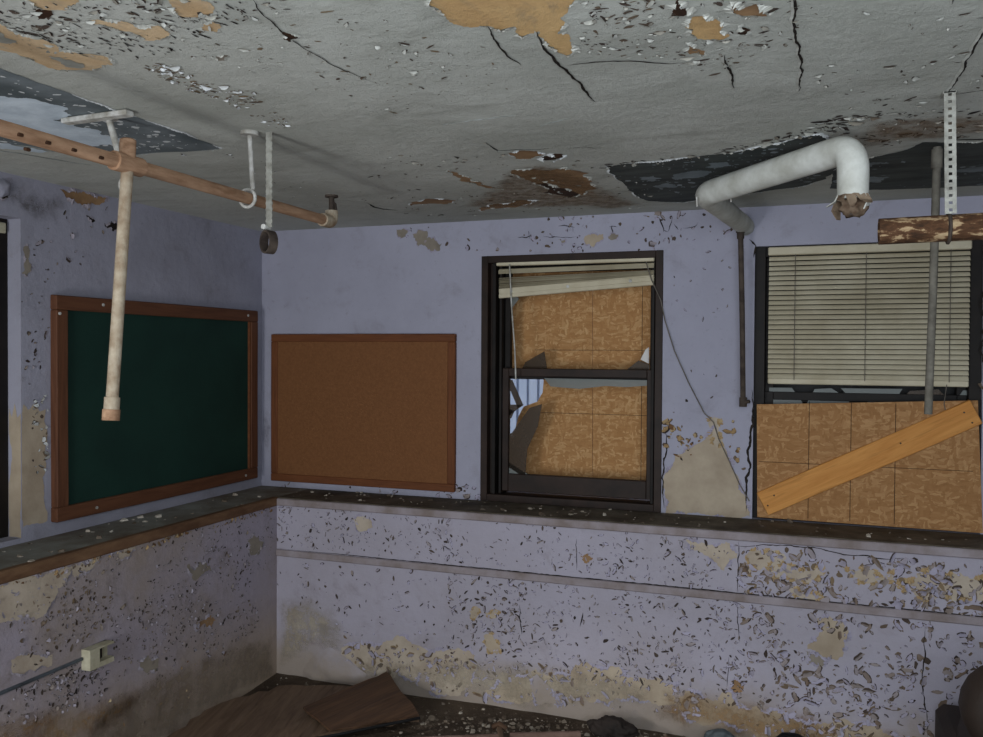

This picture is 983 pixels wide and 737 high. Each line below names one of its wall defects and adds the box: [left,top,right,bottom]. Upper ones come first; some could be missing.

peeling [0,69,234,158]
spalling [281,24,326,78]
peeling [336,37,454,114]
crack [486,26,521,65]
crack [534,31,685,102]
peeling [423,0,817,76]
crack [789,0,804,92]
crack [946,24,983,94]
peeling [390,95,983,253]
peeling [23,318,50,385]
peeling [662,411,752,518]
peeling [0,506,983,737]